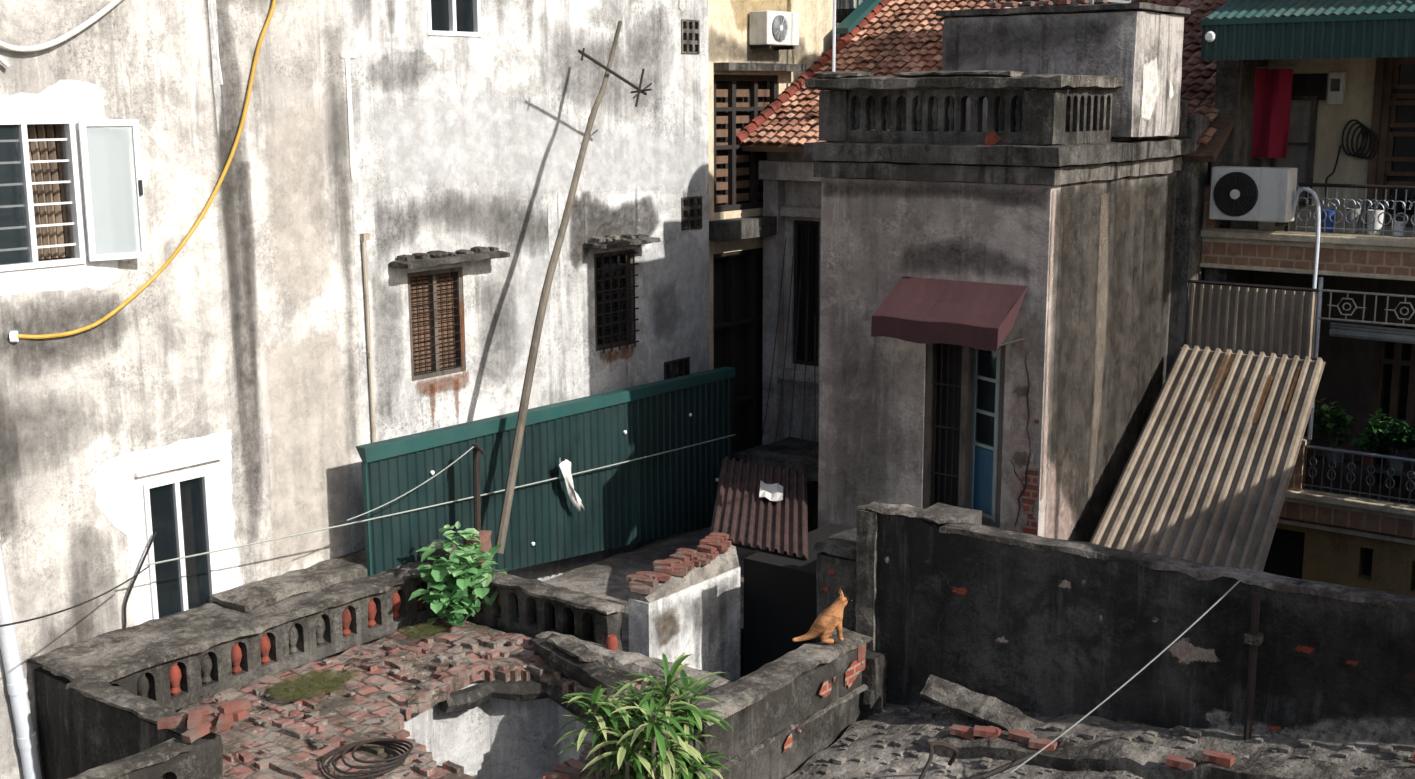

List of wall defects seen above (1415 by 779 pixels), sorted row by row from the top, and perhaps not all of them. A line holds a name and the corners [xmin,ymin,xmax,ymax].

leakage [212,3,260,504]
corrosion [419,374,468,420]
crack [1009,351,1031,527]
peeling [1004,190,1076,540]
corrosion [1209,355,1244,402]
corrosion [1252,374,1274,422]
corrosion [1284,367,1302,411]
leakage [1209,599,1415,705]